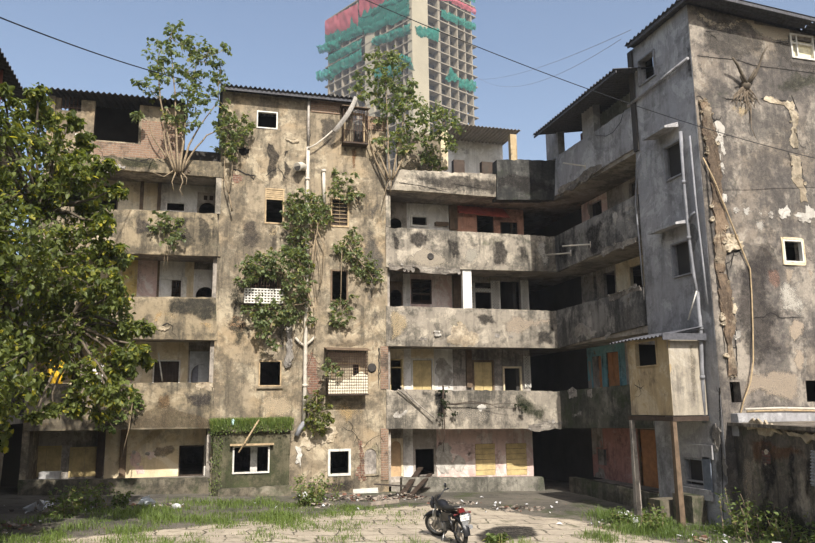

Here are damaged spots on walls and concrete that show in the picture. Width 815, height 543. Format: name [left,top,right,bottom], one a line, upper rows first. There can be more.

leakage [267,143,291,181]
spalling [759,96,815,223]
spalling [698,98,750,378]
leakage [737,243,803,364]
flaking render [745,350,804,399]
flaking render [790,319,804,340]